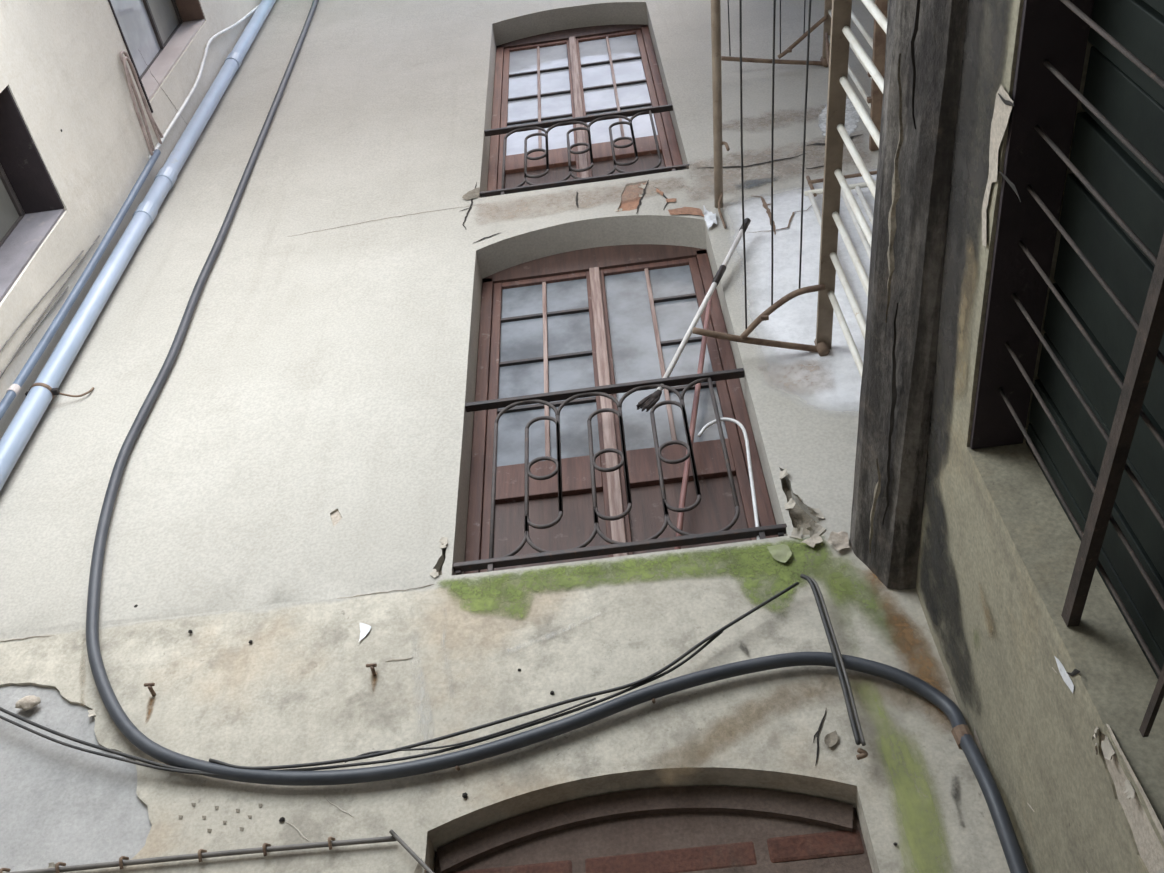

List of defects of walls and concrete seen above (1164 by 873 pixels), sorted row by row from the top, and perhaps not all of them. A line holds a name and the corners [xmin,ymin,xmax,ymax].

crack [869,0,920,553]
leakage [921,0,1010,710]
spalling [767,468,826,562]
peeling [0,685,152,872]
peeling [1092,724,1164,873]